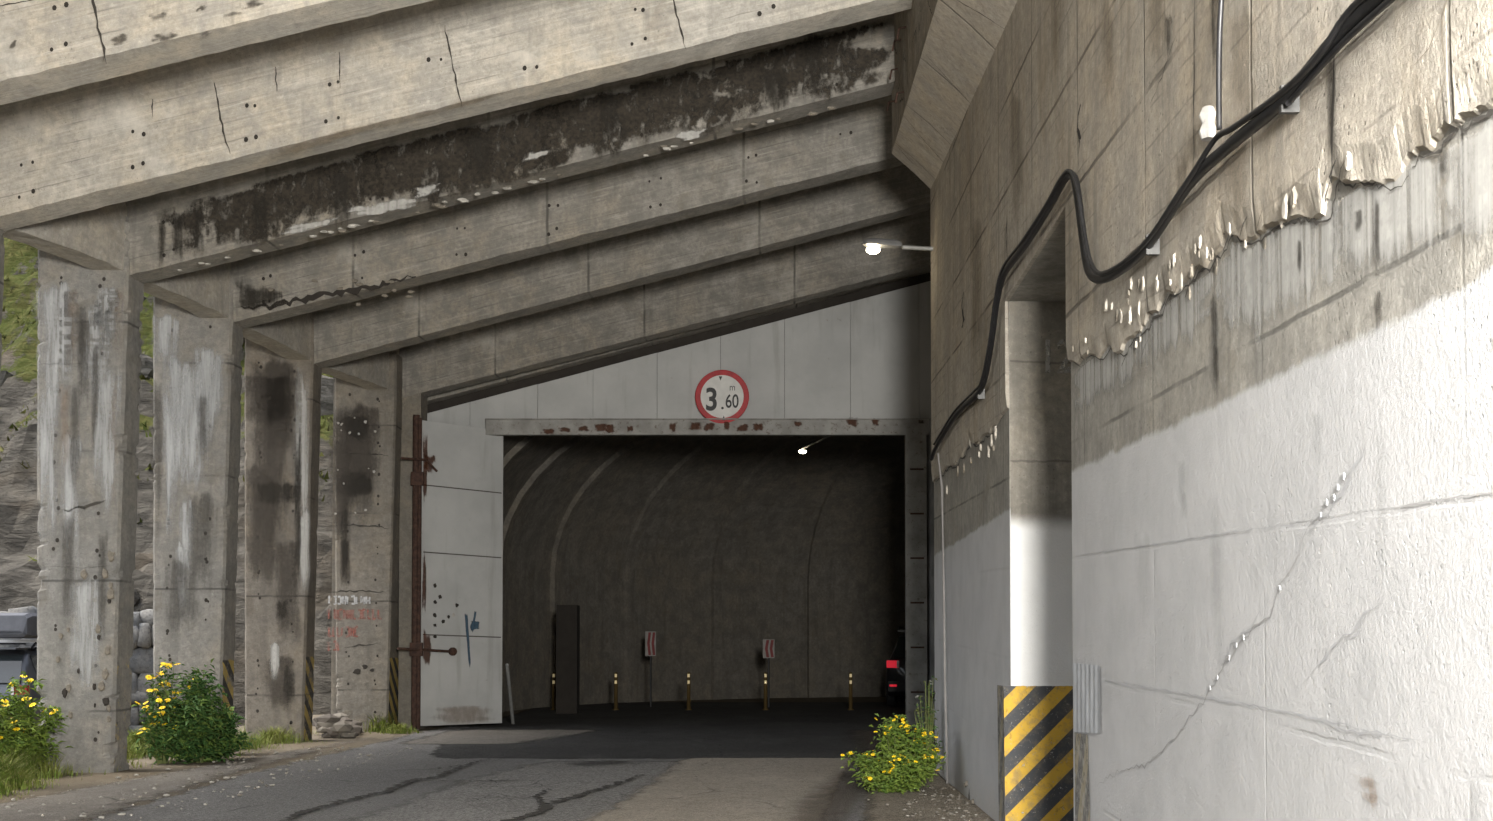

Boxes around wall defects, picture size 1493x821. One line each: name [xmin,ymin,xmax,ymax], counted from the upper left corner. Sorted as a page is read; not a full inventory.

crack [91,0,106,62]
spalling [240,275,416,310]
spalling [309,220,380,238]
spalling [414,174,562,214]
peeling [1072,109,1493,370]
water stain [38,282,121,687]
water stain [154,315,222,608]
water stain [248,358,309,706]
water stain [330,405,378,580]
crack [1076,444,1427,783]
crack [1382,492,1493,512]